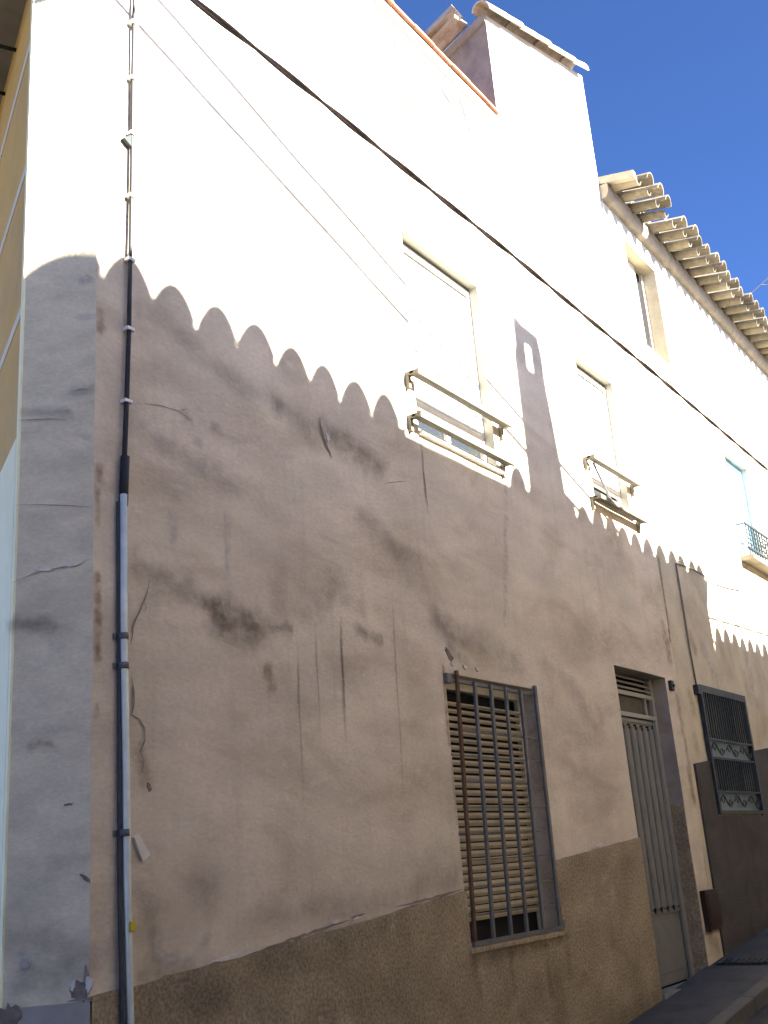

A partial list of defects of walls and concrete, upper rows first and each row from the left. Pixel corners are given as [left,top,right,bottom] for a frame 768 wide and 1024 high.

crack [15,560,87,582]
crack [131,676,146,770]
spalling [69,976,94,1002]
spalling [0,1003,22,1024]